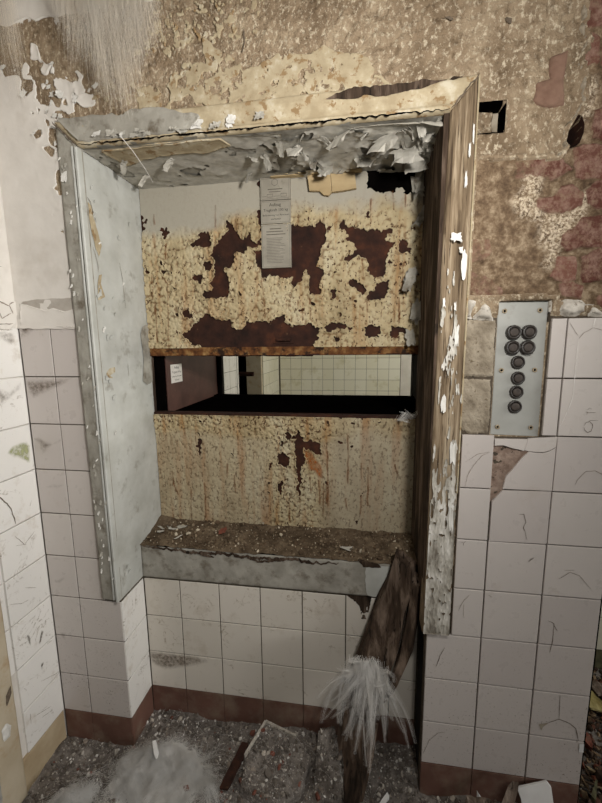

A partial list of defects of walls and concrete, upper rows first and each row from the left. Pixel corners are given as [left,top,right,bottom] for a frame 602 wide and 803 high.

peeling [0,0,463,331]
crack [0,301,14,330]
peeling [141,325,153,385]
corrosion [142,216,172,274]
corrosion [176,210,411,357]
peeling [402,266,421,346]
flaking render [438,0,602,434]
crack [560,318,601,433]
corrosion [269,430,329,510]
spalling [489,445,529,501]
peeling [423,427,458,636]
peeling [347,595,372,619]